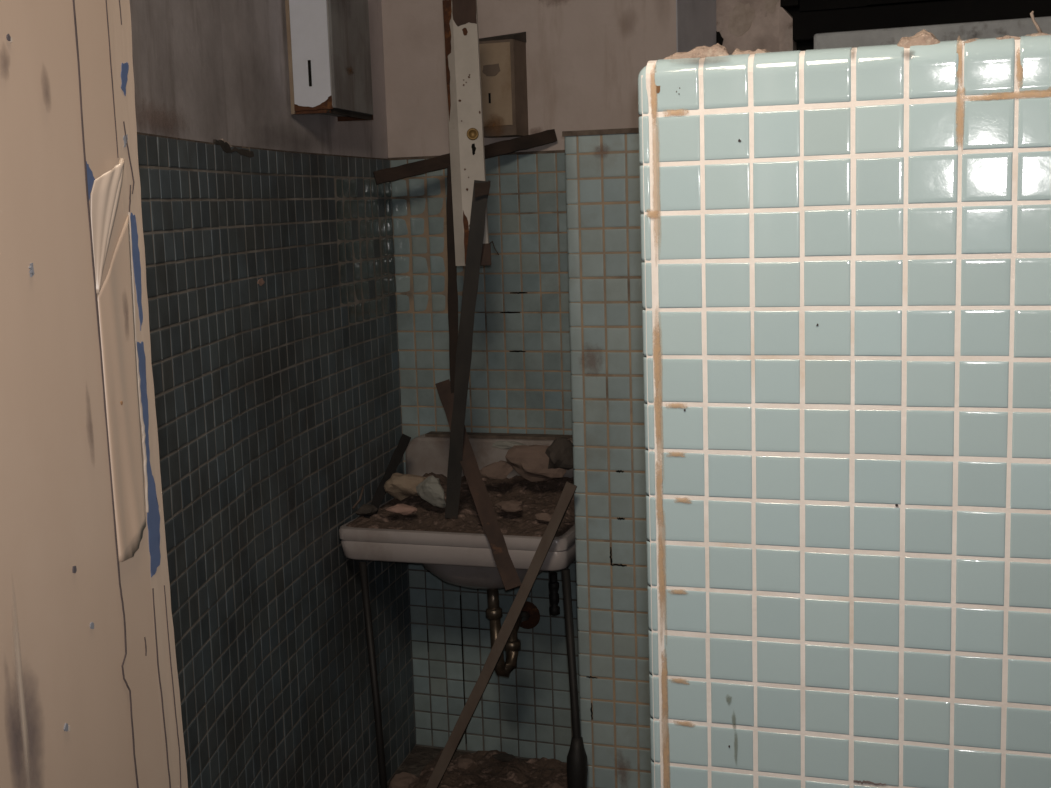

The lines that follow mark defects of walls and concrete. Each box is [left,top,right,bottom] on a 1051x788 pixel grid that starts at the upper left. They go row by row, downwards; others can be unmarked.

peeling [90,158,149,562]